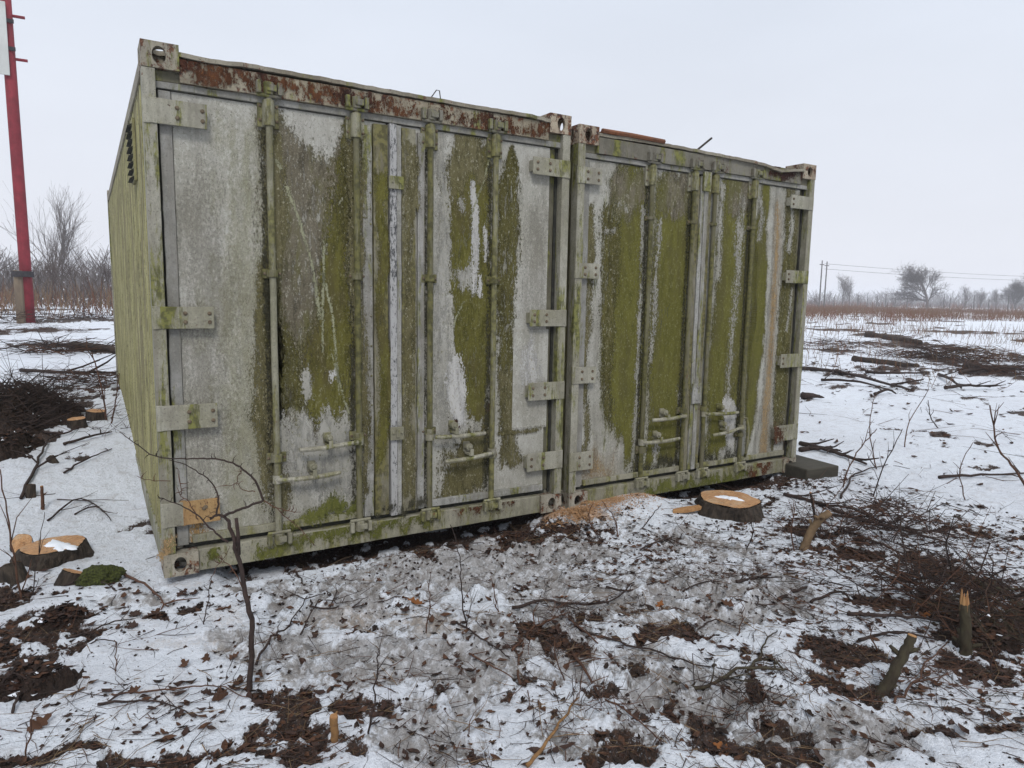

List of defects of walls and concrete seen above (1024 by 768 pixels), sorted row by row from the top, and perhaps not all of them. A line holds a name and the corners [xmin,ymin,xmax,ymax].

rust [179,59,550,139]
water stain [258,129,275,523]
water stain [348,286,356,504]
water stain [482,162,493,491]
water stain [626,187,691,473]
water stain [697,200,751,463]